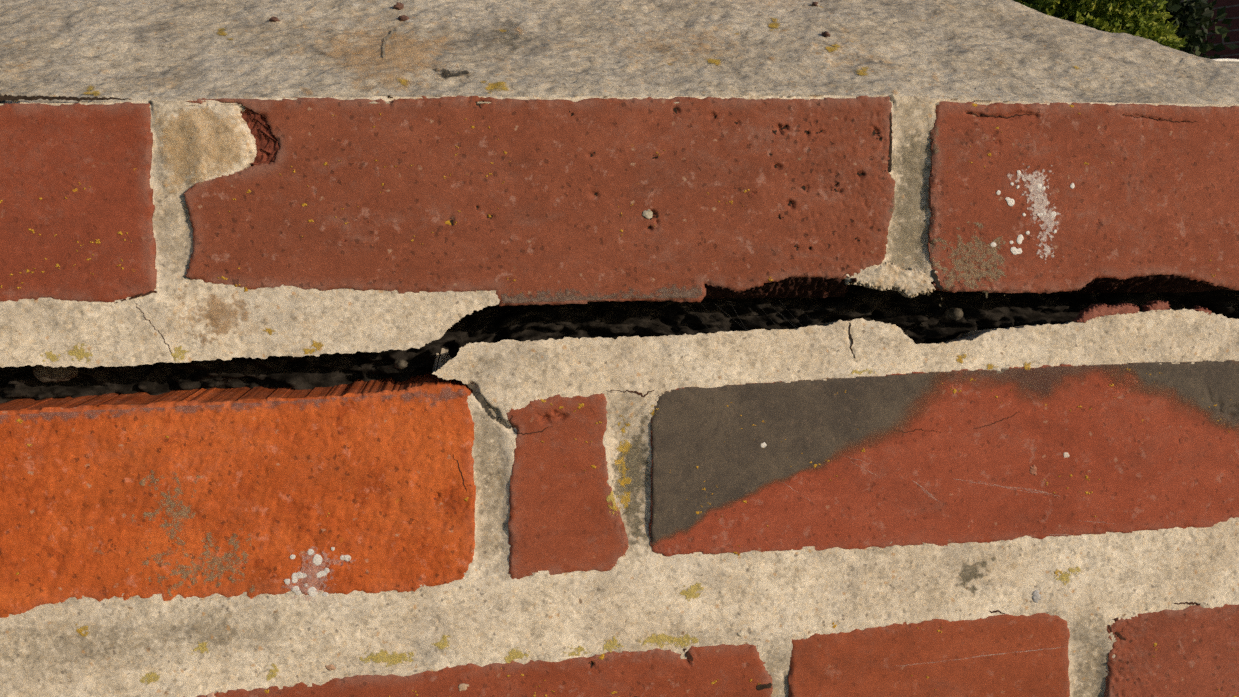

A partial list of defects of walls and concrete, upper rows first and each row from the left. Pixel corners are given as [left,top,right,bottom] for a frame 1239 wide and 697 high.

spalling [163,107,280,182]
crack [0,269,1239,435]